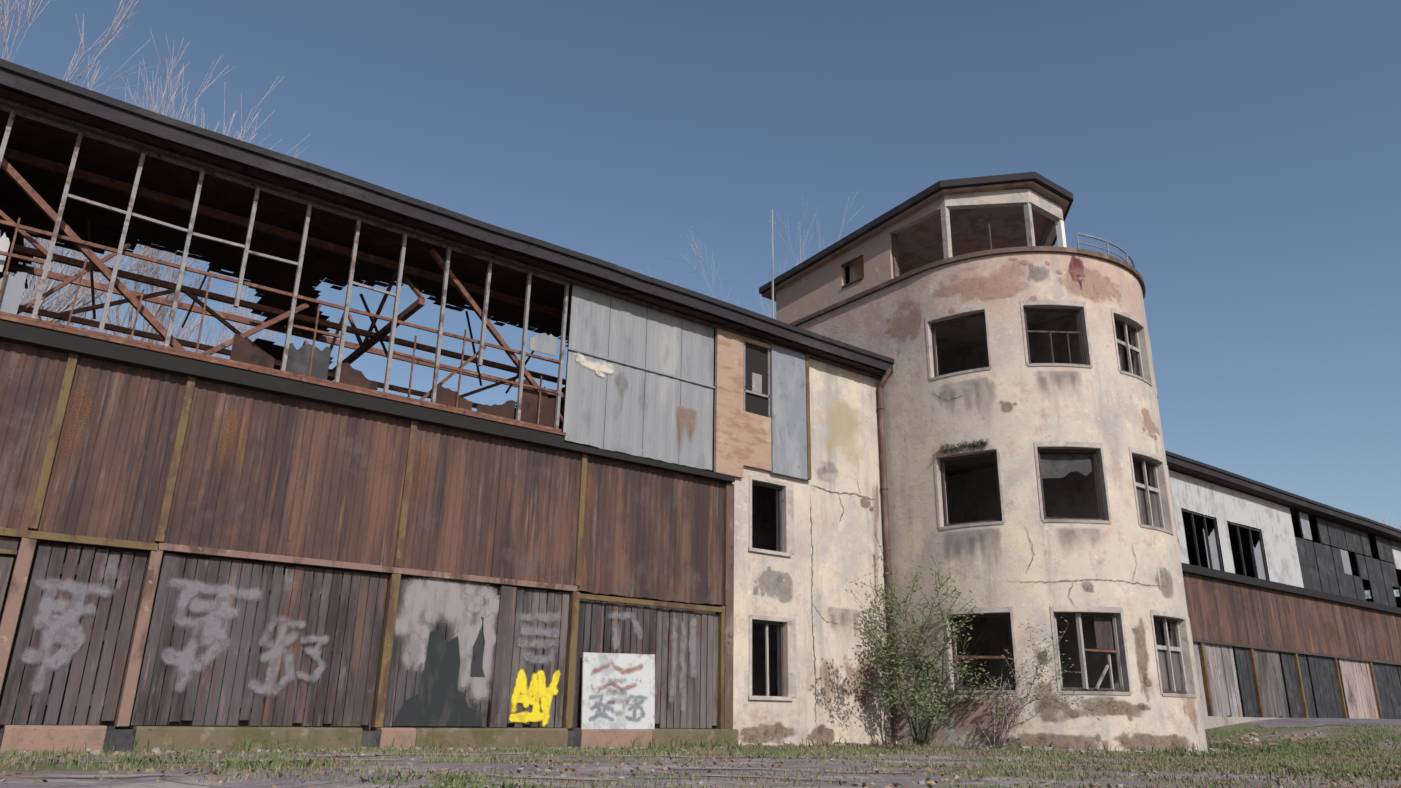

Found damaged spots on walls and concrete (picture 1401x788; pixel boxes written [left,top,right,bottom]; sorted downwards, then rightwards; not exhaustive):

flaking render [936,257,1119,313]
flaking render [887,300,922,354]
crack [810,481,875,729]
crack [1012,530,1163,605]